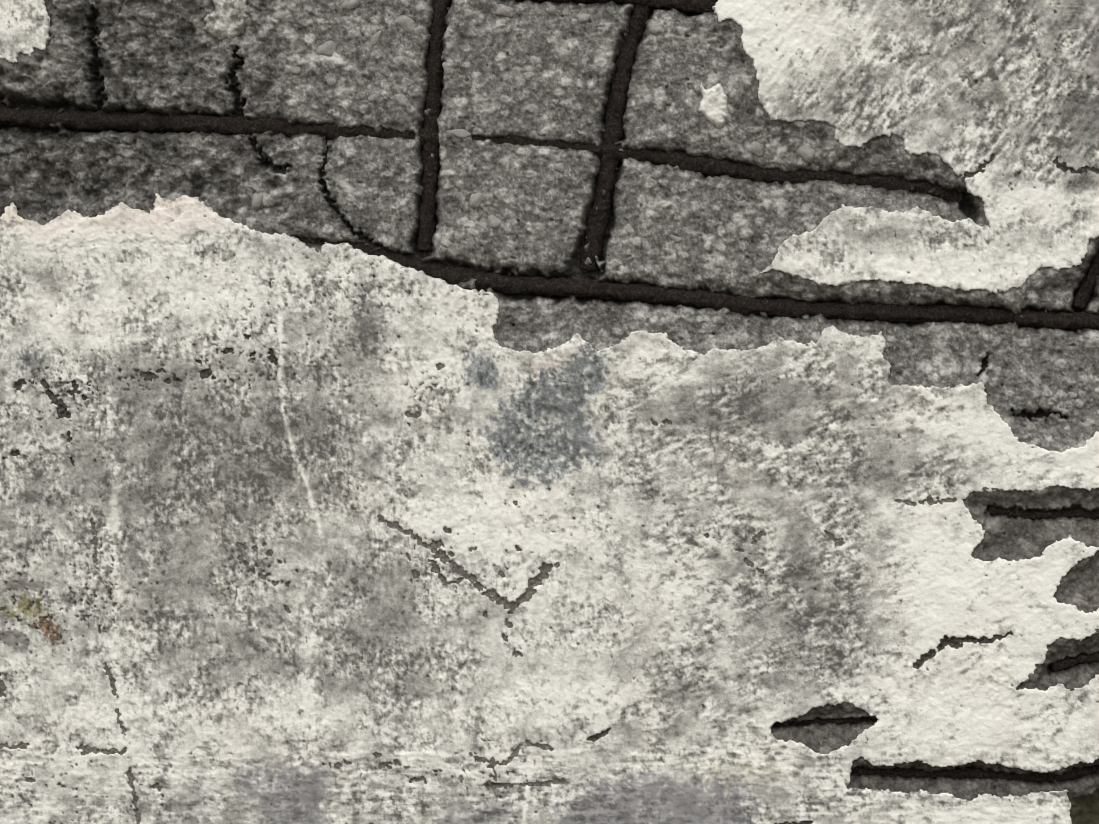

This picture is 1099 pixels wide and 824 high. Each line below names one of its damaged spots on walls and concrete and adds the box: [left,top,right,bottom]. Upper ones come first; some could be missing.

spalling [0,0,1099,453]
crack [377,515,560,614]
hole [736,531,766,574]
spalling [962,485,1099,613]
crack [913,631,1013,669]
spalling [1016,629,1099,691]
spalling [771,702,878,754]
spalling [846,757,1099,801]